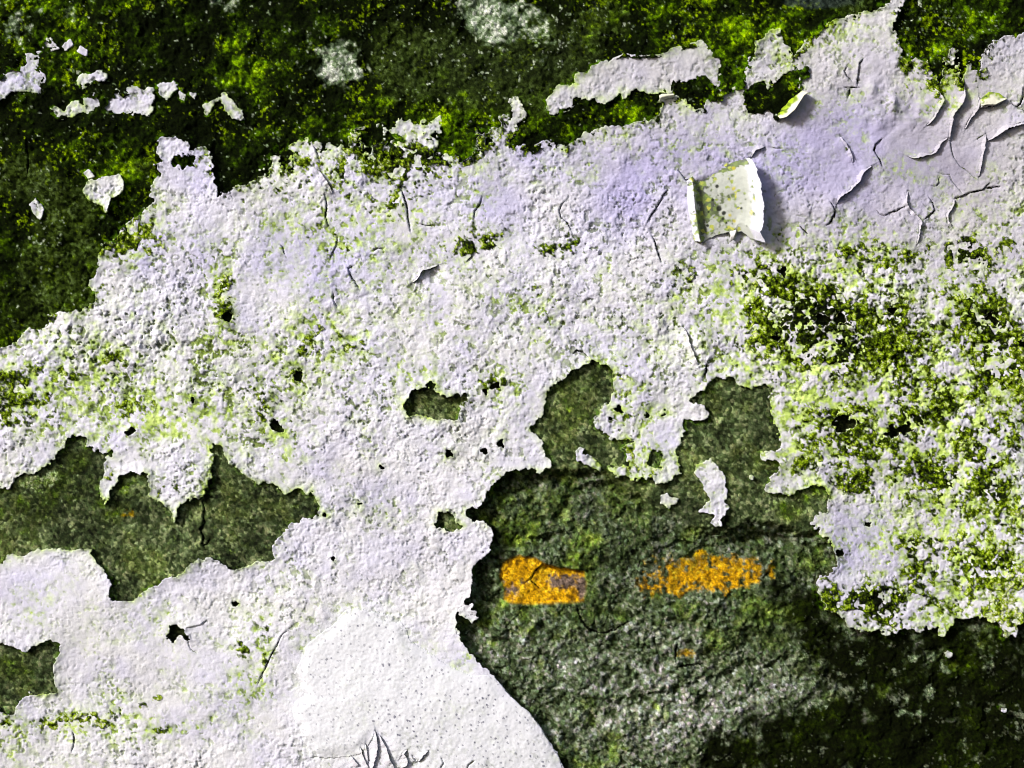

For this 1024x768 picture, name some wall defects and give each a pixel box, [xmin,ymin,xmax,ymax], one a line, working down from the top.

peeling [0,0,891,348]
crack [800,137,882,234]
crack [878,87,1024,245]
peeling [404,381,468,421]
peeling [0,435,326,601]
spalling [434,360,843,768]
peeling [0,639,60,714]